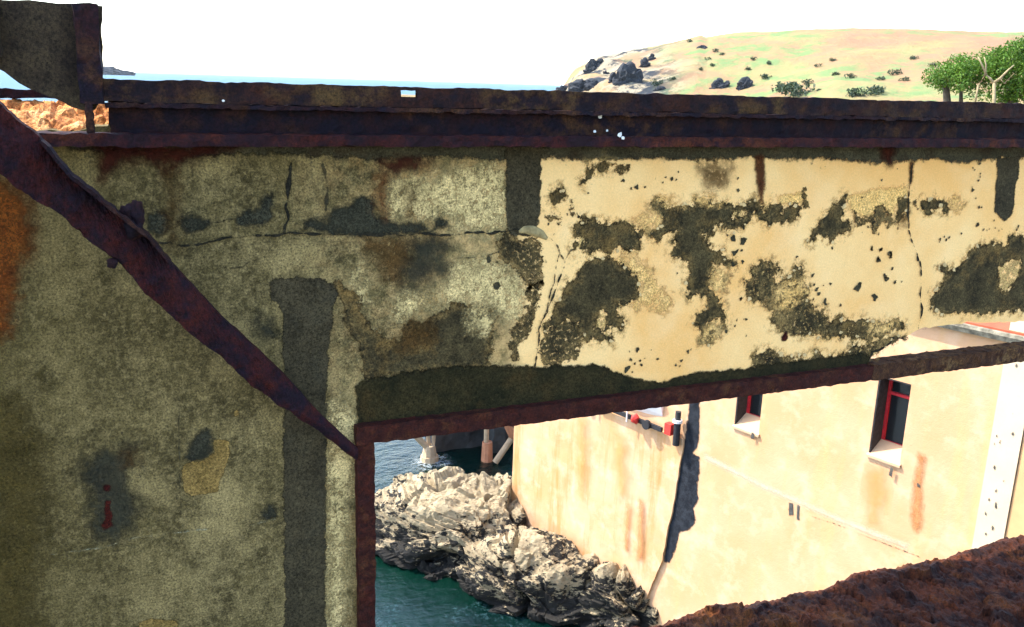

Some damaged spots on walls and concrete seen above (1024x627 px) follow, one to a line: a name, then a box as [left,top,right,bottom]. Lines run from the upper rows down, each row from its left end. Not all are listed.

rust [0,182,35,333]
rust [96,146,236,242]
crack [159,162,519,269]
leakage [304,196,451,289]
crack [534,235,574,367]
rust [699,161,732,187]
rust [755,155,766,204]
crack [869,163,923,360]
rust [625,499,643,558]
rust [911,455,925,530]